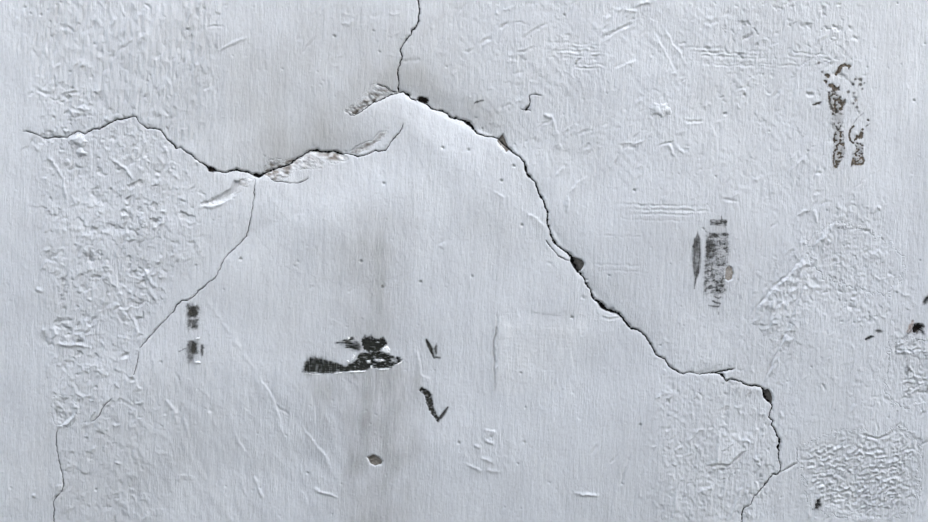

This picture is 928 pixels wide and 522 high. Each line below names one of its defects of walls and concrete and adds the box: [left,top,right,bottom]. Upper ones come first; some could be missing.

spalling [263,131,387,182]
spalling [201,178,252,205]
crack [23,116,403,375]
crack [347,0,793,520]
peeling [692,216,733,307]
peeling [304,337,402,375]
spalling [419,387,448,422]
crack [53,432,64,518]
peeling [367,455,382,465]